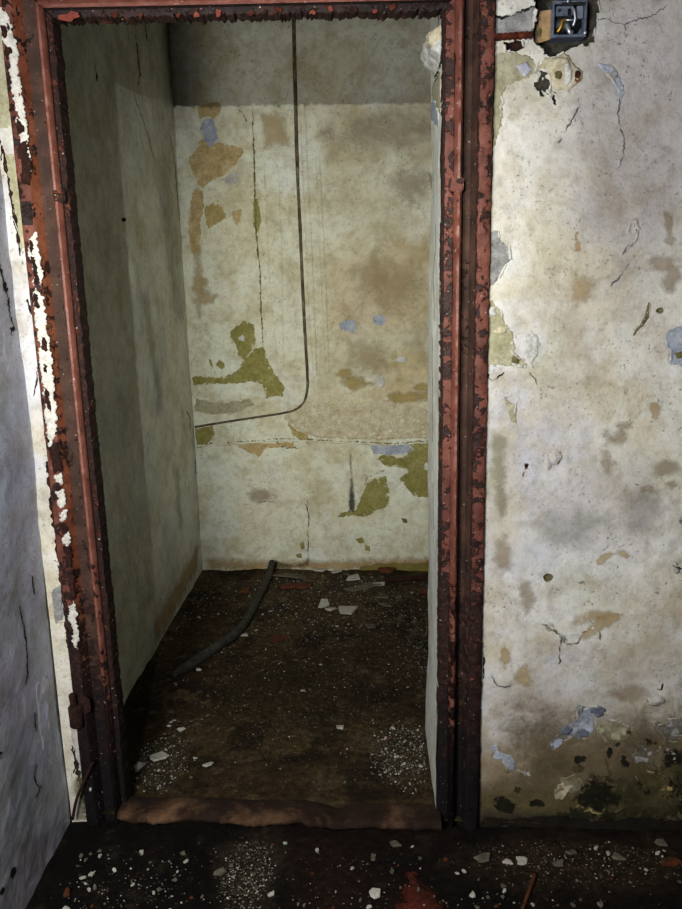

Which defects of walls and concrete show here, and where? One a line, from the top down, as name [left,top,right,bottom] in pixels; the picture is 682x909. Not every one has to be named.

crack [495,4,536,20]
rust [9,104,32,186]
peeling [492,0,601,152]
crack [537,88,580,143]
crack [0,140,32,336]
rust [29,240,40,309]
peeling [190,320,285,399]
leakage [336,369,371,390]
leakage [388,384,428,404]
rust [47,442,62,474]
spalling [238,374,429,518]
leakage [480,717,682,830]